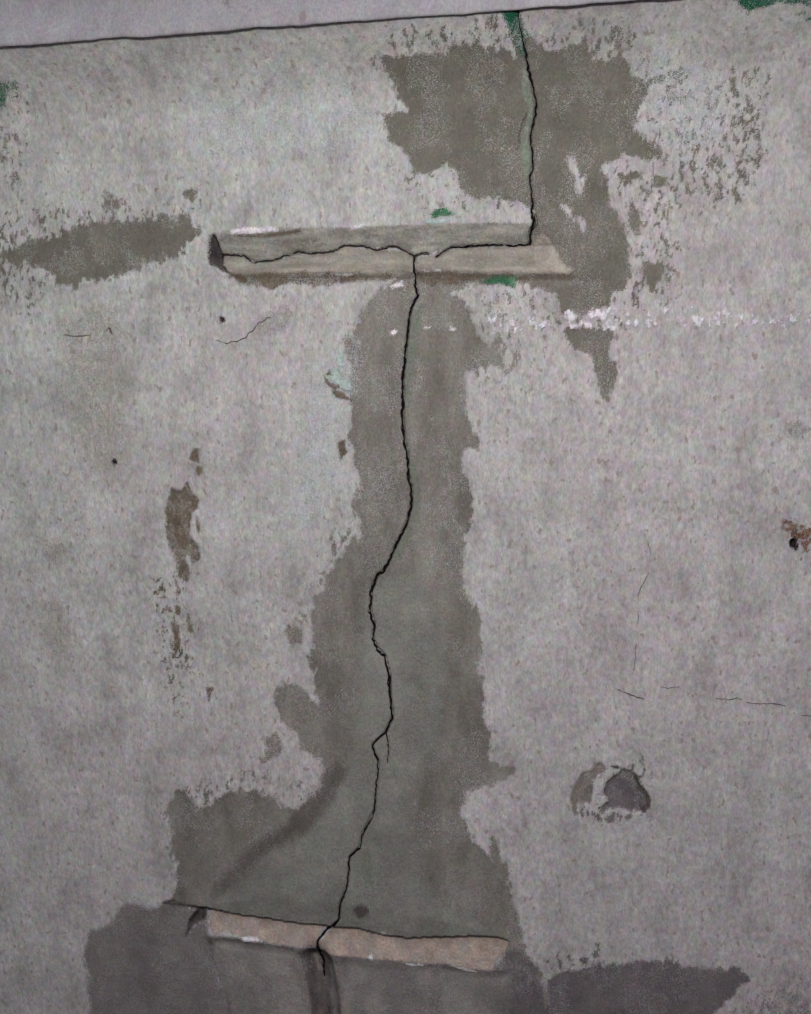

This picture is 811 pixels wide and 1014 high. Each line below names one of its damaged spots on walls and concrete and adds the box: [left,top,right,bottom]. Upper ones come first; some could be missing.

peeling [0,93,38,191]
peeling [0,186,208,324]
crack [221,10,538,976]
peeling [150,12,770,980]
rust [781,519,811,559]
leakage [82,897,811,1014]